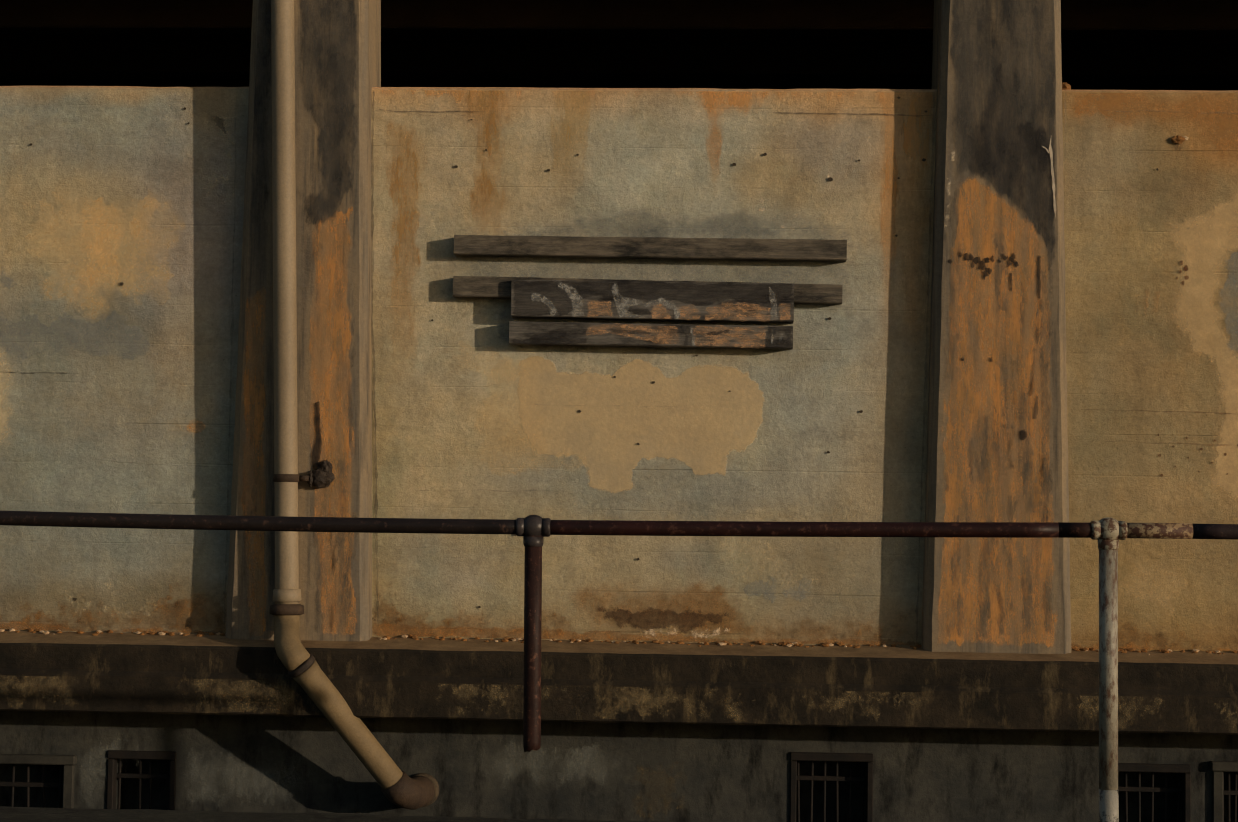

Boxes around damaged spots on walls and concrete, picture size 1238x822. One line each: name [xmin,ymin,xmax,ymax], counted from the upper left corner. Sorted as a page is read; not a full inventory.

damp [300,0,356,221]
rust [244,207,357,633]
rust [943,178,1052,522]
rust [939,537,1057,647]